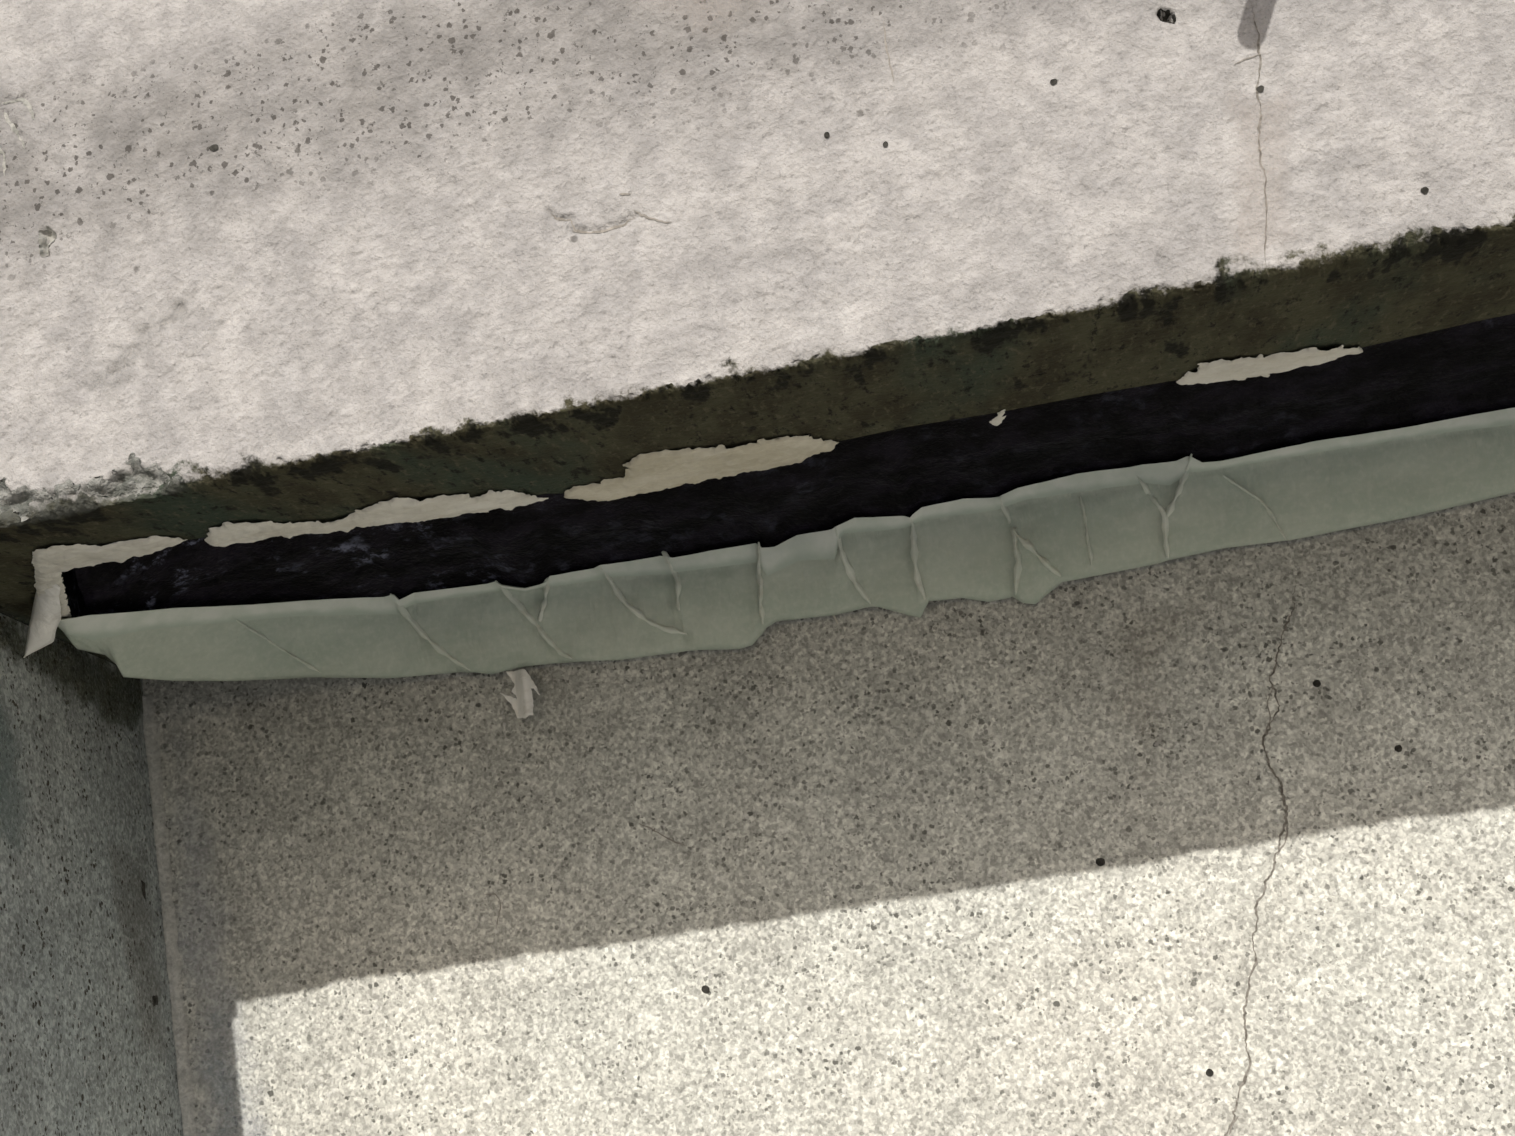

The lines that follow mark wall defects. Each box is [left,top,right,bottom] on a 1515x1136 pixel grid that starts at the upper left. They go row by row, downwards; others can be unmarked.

spalling [0,452,183,522]
crack [1224,572,1299,1136]